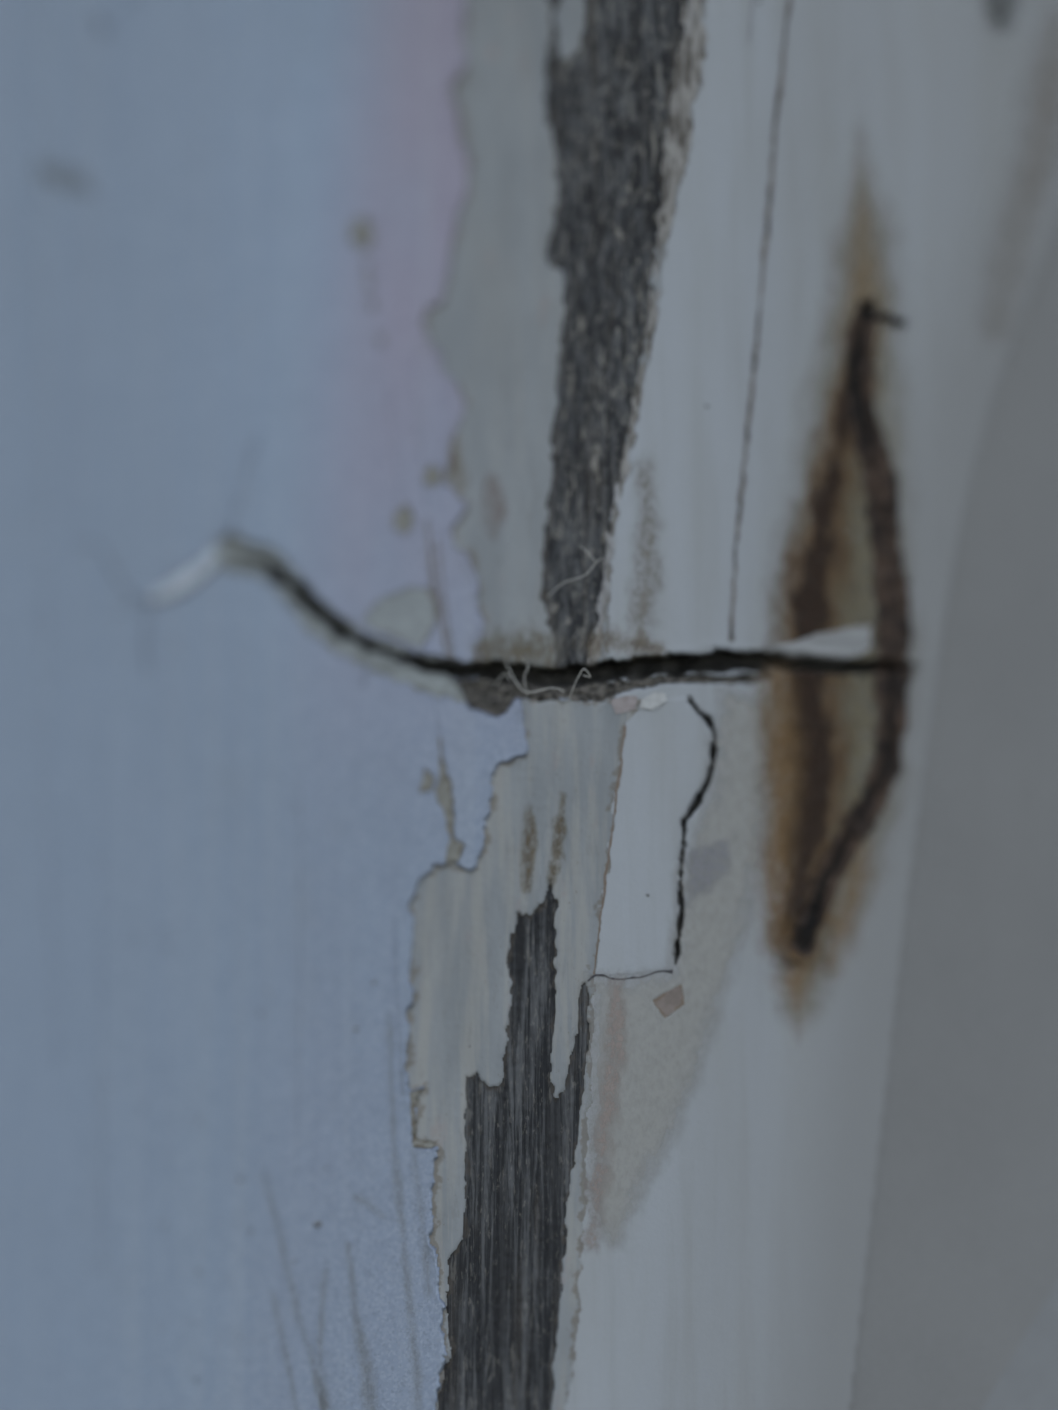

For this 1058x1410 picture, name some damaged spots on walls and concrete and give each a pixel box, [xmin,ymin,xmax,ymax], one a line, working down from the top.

crack [74,0,917,982]
peeling [422,0,586,672]
peeling [588,0,708,667]
corrosion [770,221,893,994]
peeling [405,697,642,1410]
peeling [653,984,685,1018]